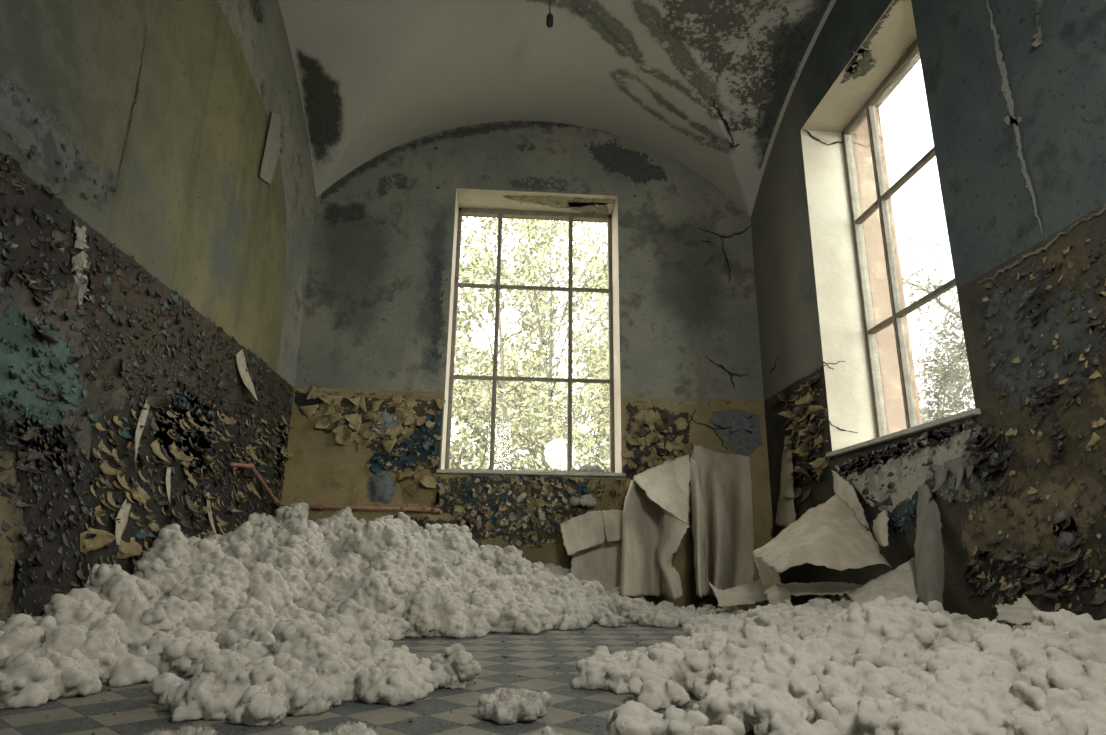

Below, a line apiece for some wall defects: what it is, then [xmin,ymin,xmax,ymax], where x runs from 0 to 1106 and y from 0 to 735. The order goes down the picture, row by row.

flaking render [260,112,284,184]
damp [298,51,342,160]
damp [325,204,365,223]
damp [585,138,668,185]
damp [527,0,733,153]
crack [697,226,751,280]
damp [756,0,831,168]
crack [987,0,1042,235]
damp [422,255,448,362]
peeling [589,402,694,510]
peeling [776,204,1106,626]